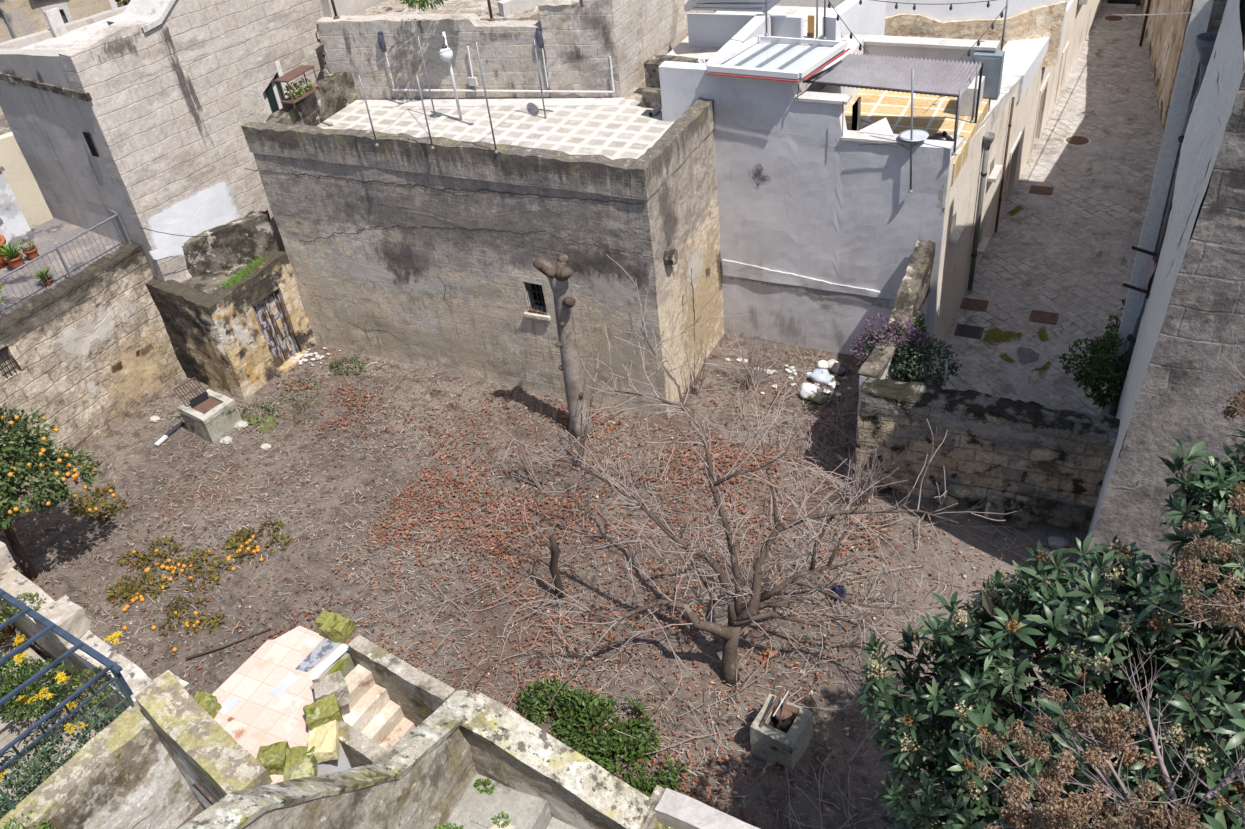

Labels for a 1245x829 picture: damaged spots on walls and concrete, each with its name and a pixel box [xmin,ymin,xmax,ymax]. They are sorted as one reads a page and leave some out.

leakage [311,186,588,284]
crack [245,168,658,259]
leakage [659,181,678,248]
leakage [37,754,130,829]
leakage [430,746,449,787]